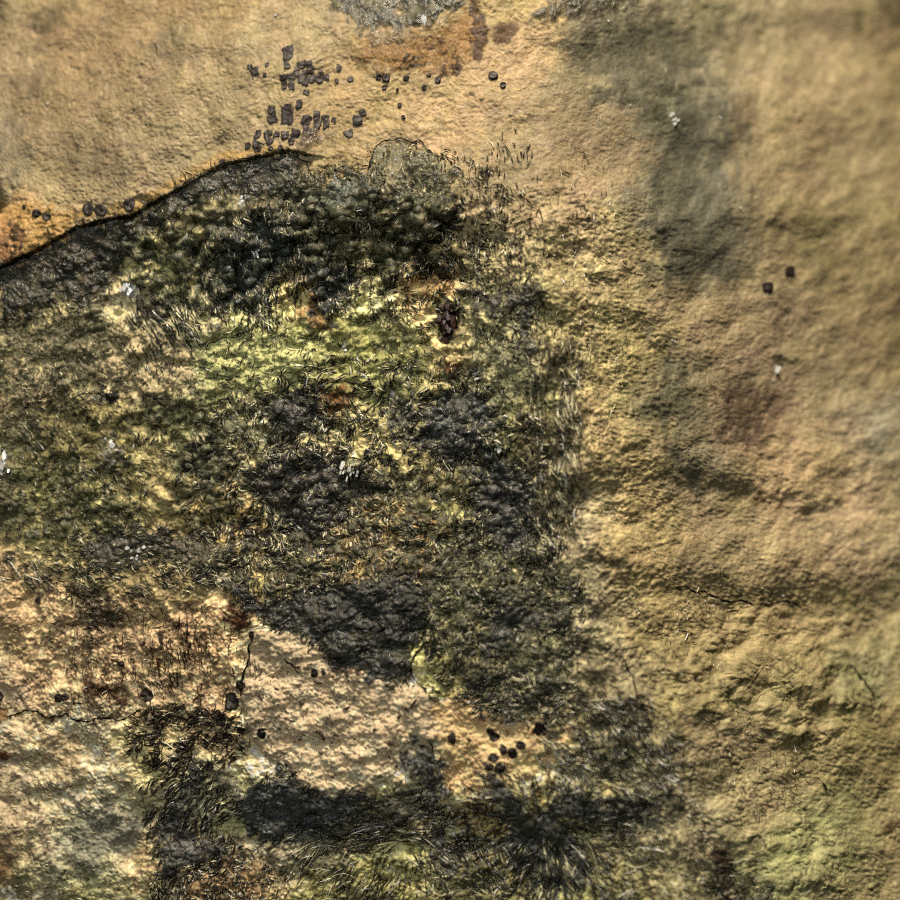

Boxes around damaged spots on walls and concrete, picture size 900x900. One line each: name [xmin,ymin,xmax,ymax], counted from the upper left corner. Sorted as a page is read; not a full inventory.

corrosion [354,0,519,77]
crack [73,157,249,225]
crack [666,585,813,614]
crack [3,702,142,722]